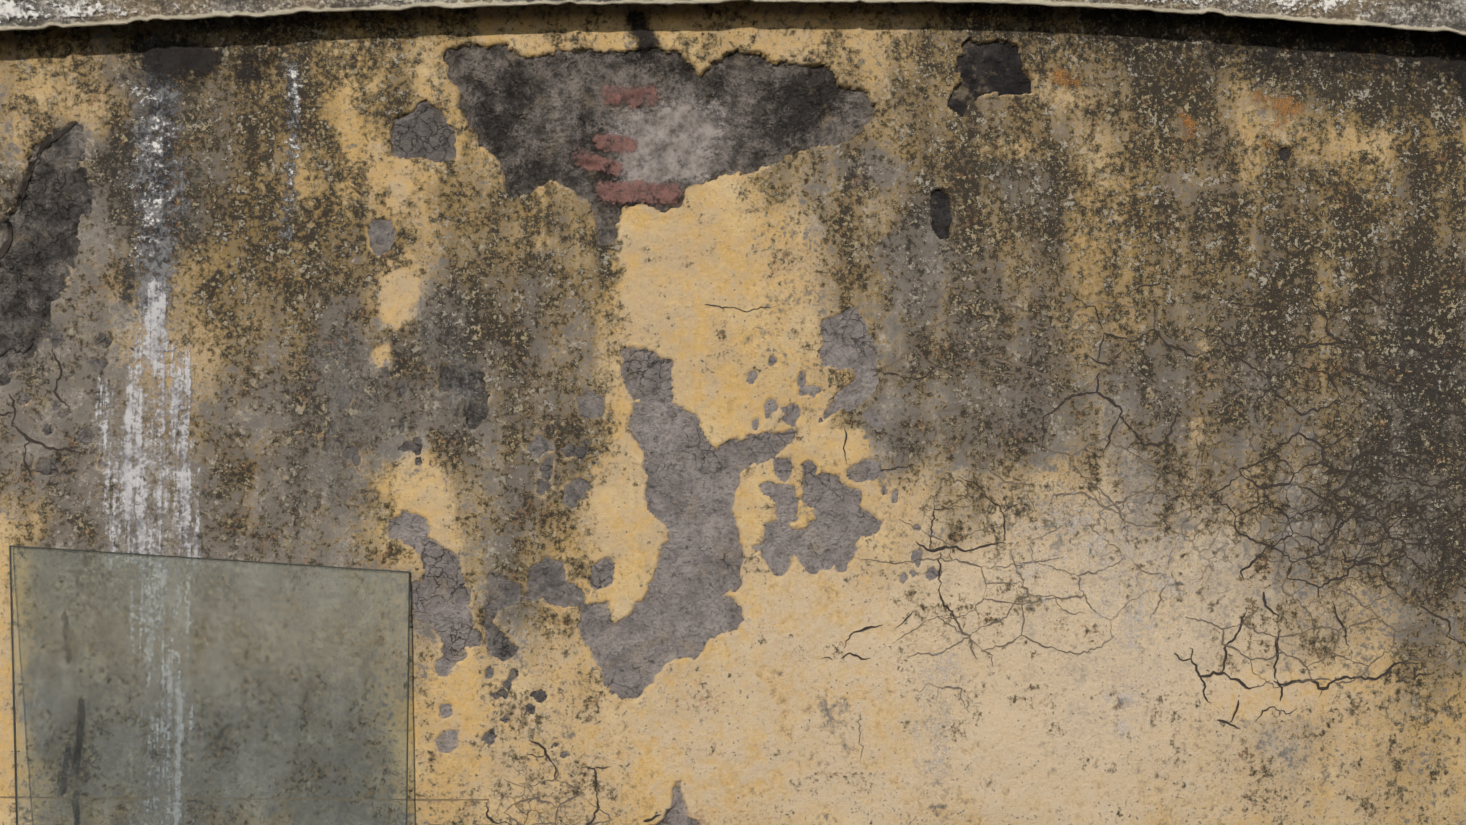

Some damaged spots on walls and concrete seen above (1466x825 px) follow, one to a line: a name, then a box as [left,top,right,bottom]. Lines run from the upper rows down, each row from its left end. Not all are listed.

spalling [947,39,1032,117]
damp [989,0,1466,100]
spalling [391,44,875,245]
spalling [0,121,96,405]
crack [705,304,778,312]
spalling [930,189,952,239]
damp [95,31,303,825]
peeling [382,307,898,745]
peeling [899,524,942,584]
crack [821,270,1466,729]
crack [0,740,662,825]
spalling [657,781,699,825]